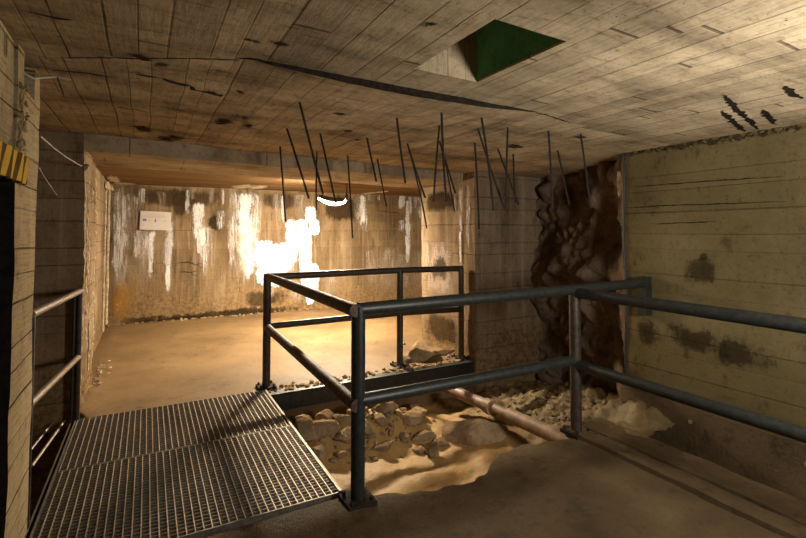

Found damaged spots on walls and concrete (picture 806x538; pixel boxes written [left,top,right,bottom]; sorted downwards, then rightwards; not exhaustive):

spalling [16,81,30,154]
leakage [81,154,336,379]
spalling [286,102,337,210]
leakage [326,191,388,228]
spalling [344,130,387,206]
leakage [366,186,470,293]
spalling [396,112,456,228]
spalling [474,118,524,229]